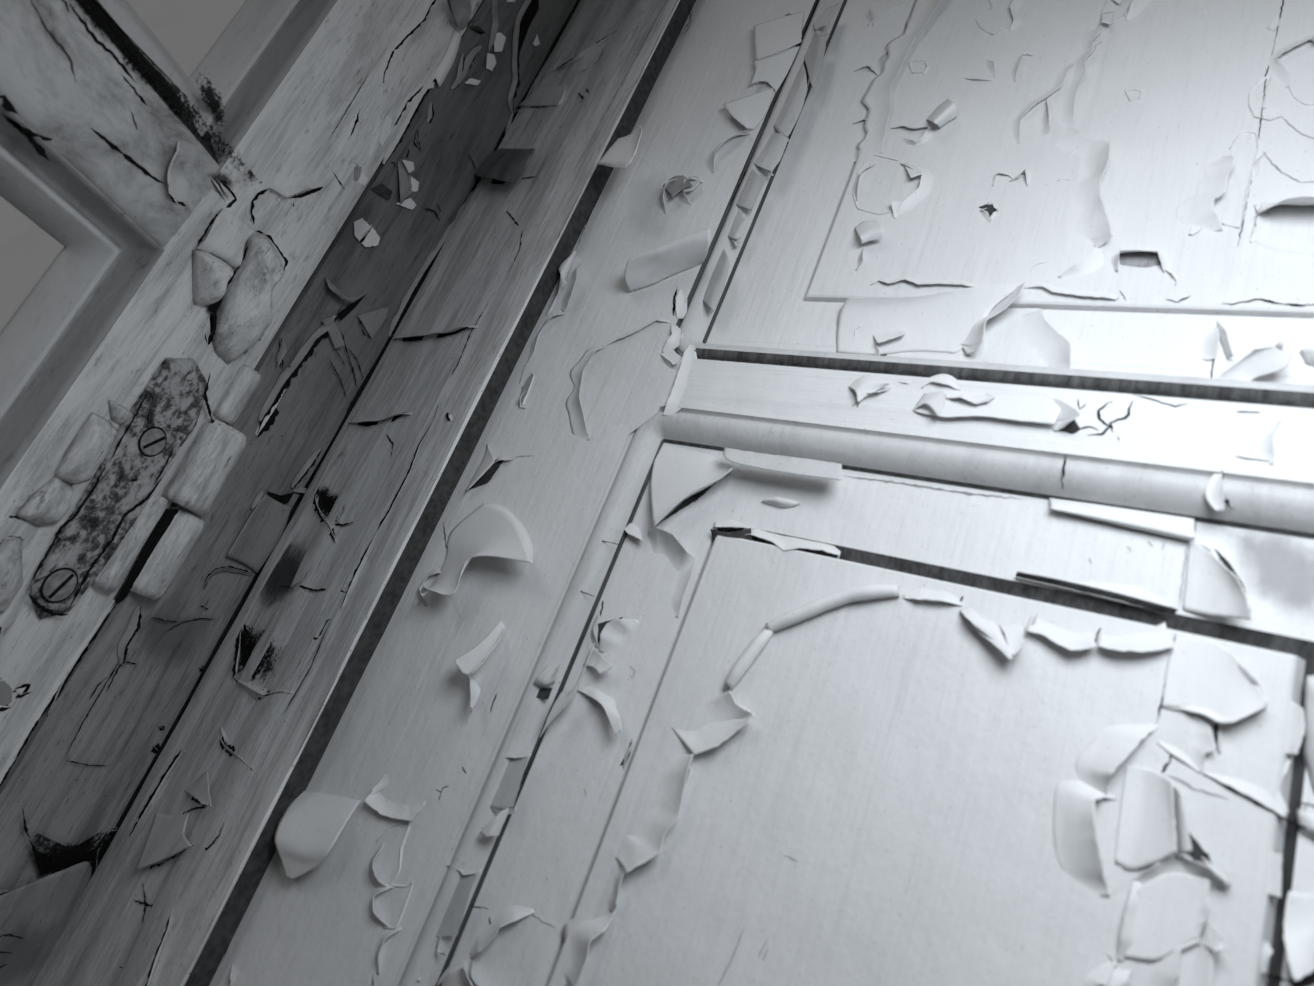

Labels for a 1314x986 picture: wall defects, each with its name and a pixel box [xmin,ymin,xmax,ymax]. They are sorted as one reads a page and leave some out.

crack [0,95,53,162]
crack [31,0,166,185]
water stain [75,0,261,183]
peeling [196,175,323,345]
peeling [836,0,1191,369]
peeling [1176,34,1314,254]
peeling [849,374,1082,434]
spalling [115,509,179,605]
peeling [416,503,533,712]
peeling [435,498,1269,986]
peeling [274,774,426,986]
peeling [1261,852,1314,986]